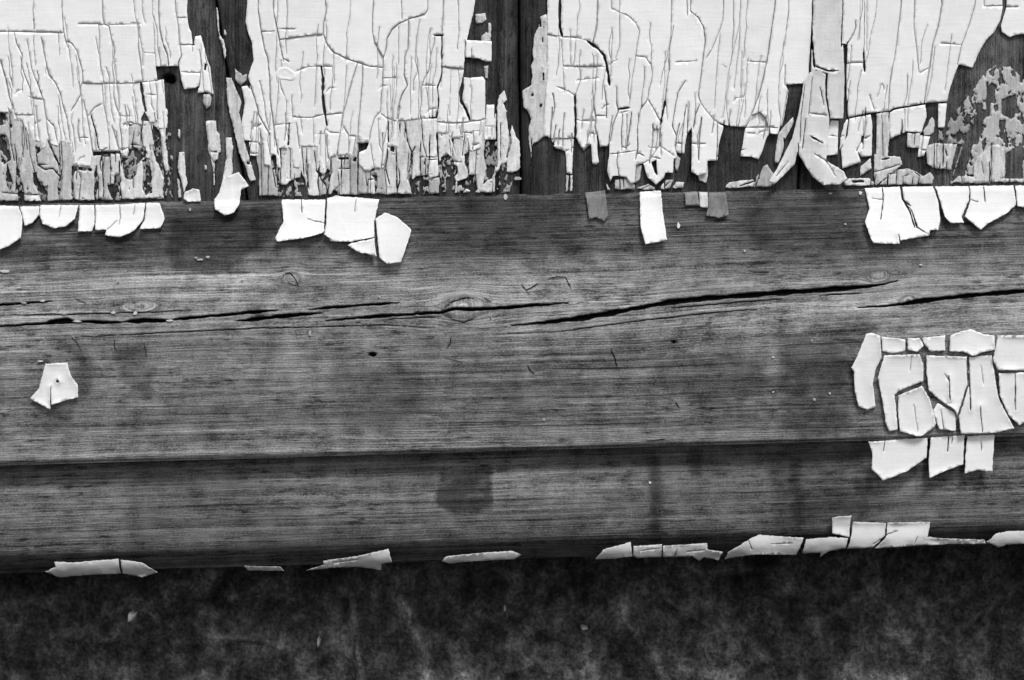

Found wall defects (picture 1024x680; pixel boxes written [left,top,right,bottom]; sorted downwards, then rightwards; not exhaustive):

peeling [0,0,1024,264]
crack [0,276,1024,368]
peeling [30,363,78,409]
peeling [851,329,1024,480]
peeling [45,559,158,577]
peeling [309,549,392,570]
peeling [442,551,521,563]
peeling [596,515,1024,561]